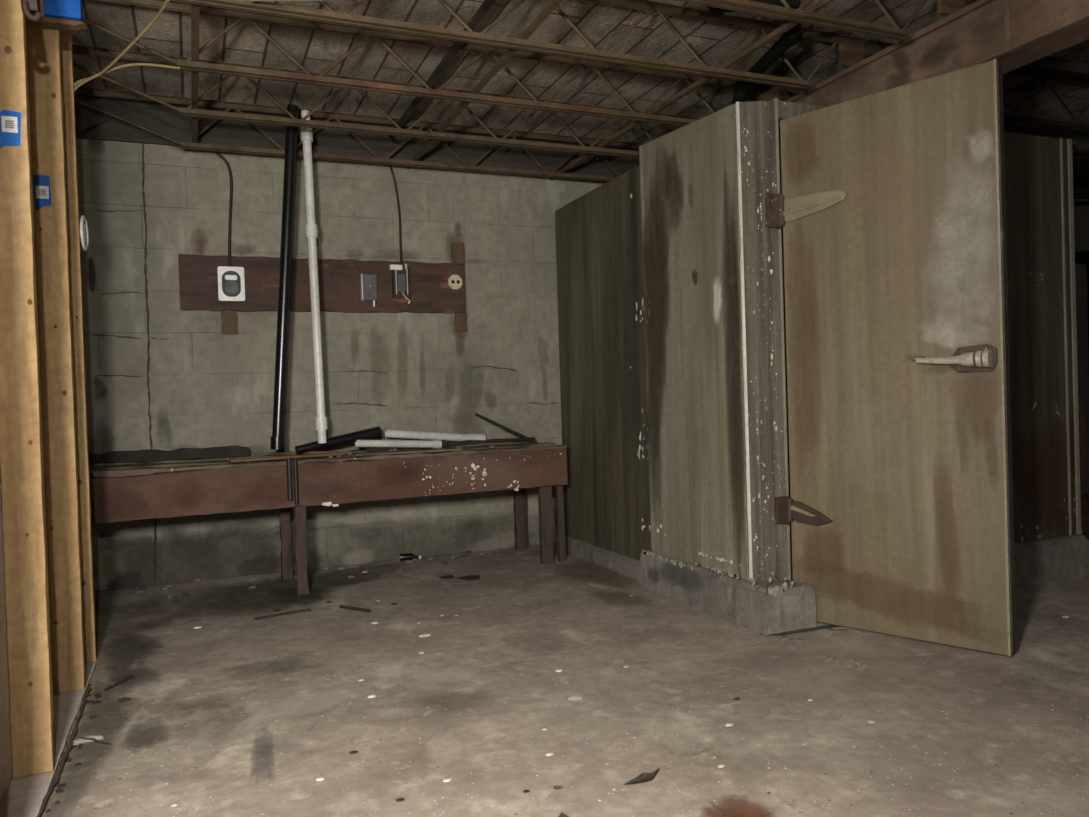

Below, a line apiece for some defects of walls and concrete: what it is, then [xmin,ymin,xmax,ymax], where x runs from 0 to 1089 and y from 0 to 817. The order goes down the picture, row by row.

water stain [643,166,677,436]
water stain [724,201,742,534]
rust [707,800,769,817]